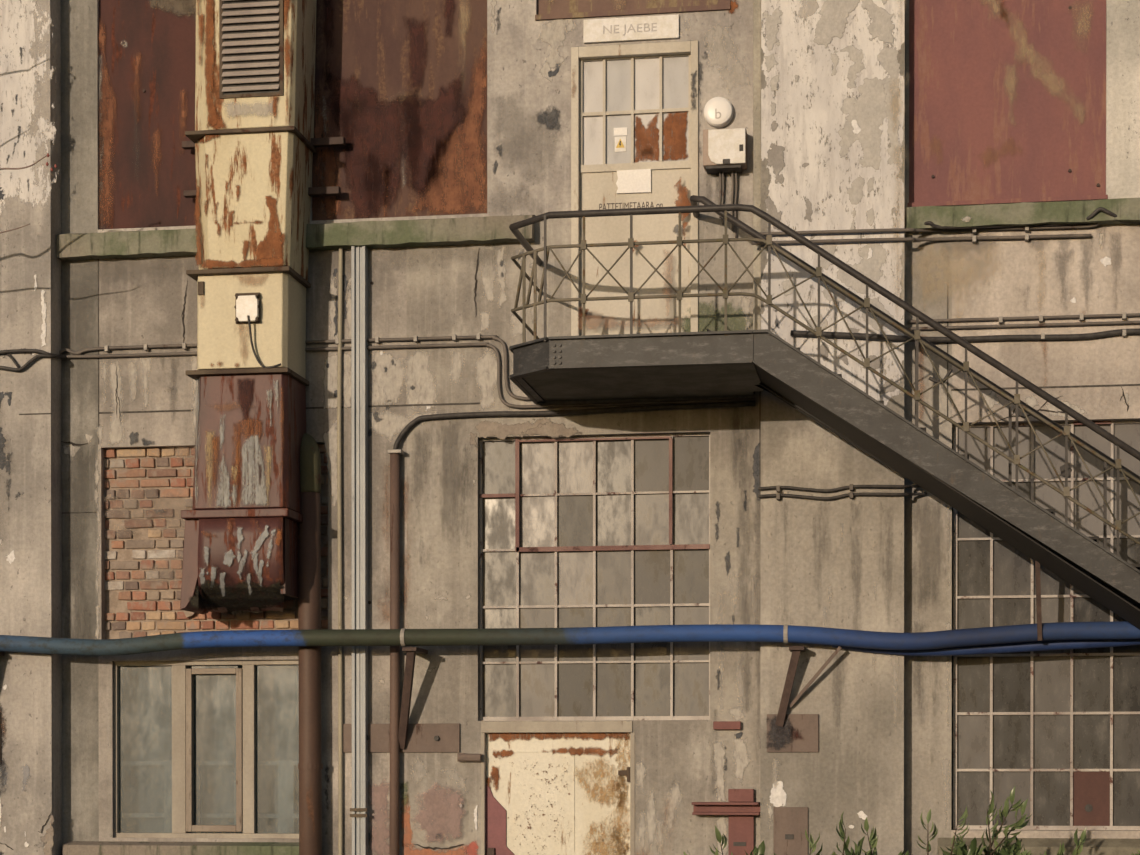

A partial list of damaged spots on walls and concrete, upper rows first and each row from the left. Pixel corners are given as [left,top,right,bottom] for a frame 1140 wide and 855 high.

rust [98,66,116,225]
rust [197,0,291,167]
rust [312,19,487,219]
rust [634,71,698,162]
peeling [762,6,785,187]
peeling [798,0,902,230]
peeling [32,274,47,355]
rust [194,179,285,269]
peeling [804,199,894,333]
peeling [0,427,11,472]
spalling [24,815,54,855]
rust [486,732,630,855]